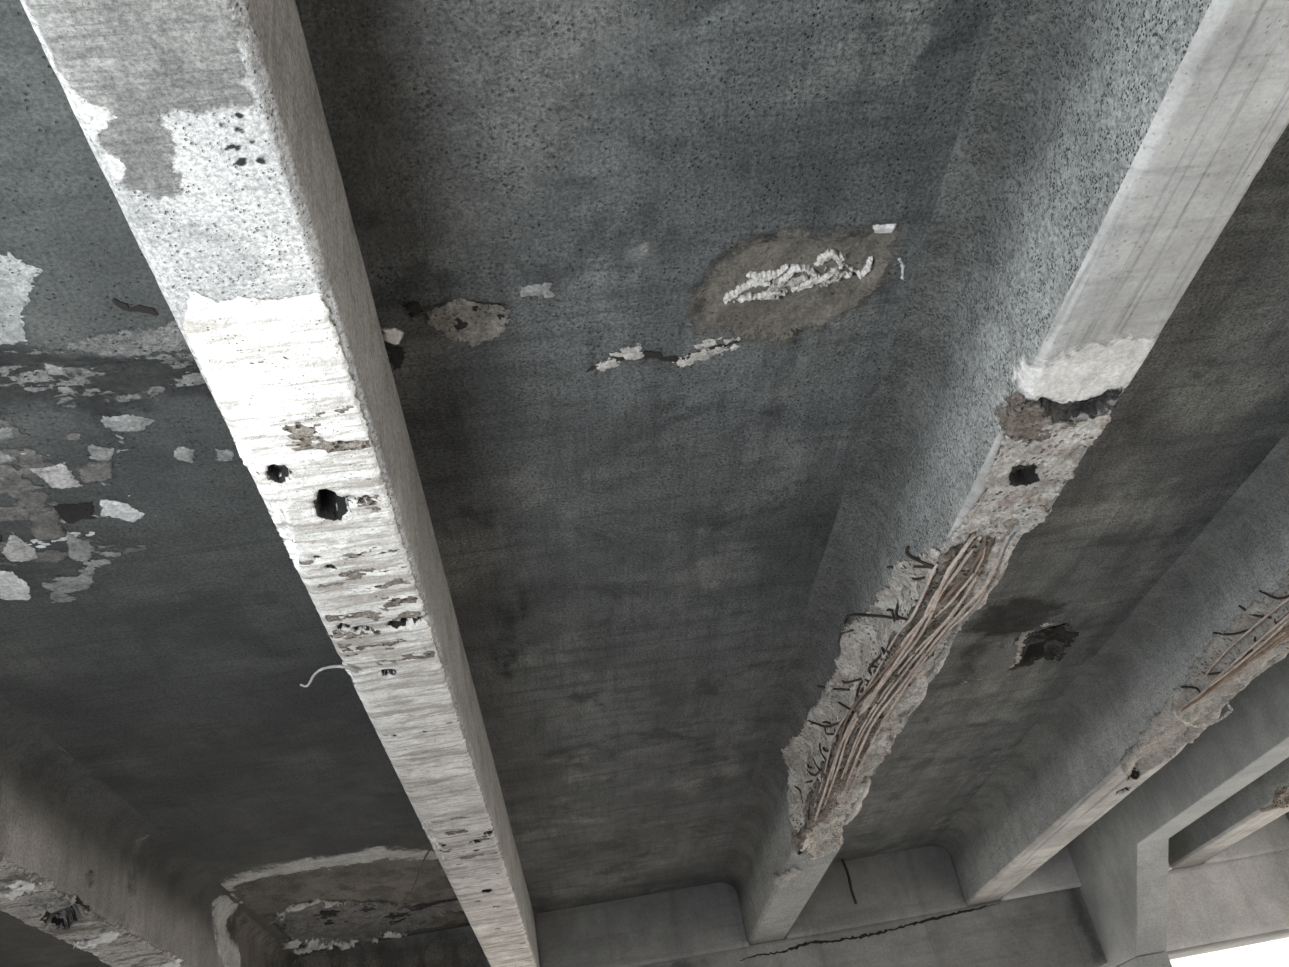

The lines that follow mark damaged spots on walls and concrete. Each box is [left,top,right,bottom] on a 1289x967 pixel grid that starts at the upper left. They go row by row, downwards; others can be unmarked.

spalling [688,224,905,347]
spalling [0,252,556,967]
corrosion [791,537,996,850]
spalling [773,330,1162,904]
spalling [1116,571,1289,794]
spalling [1260,787,1289,812]
crack [739,903,999,961]